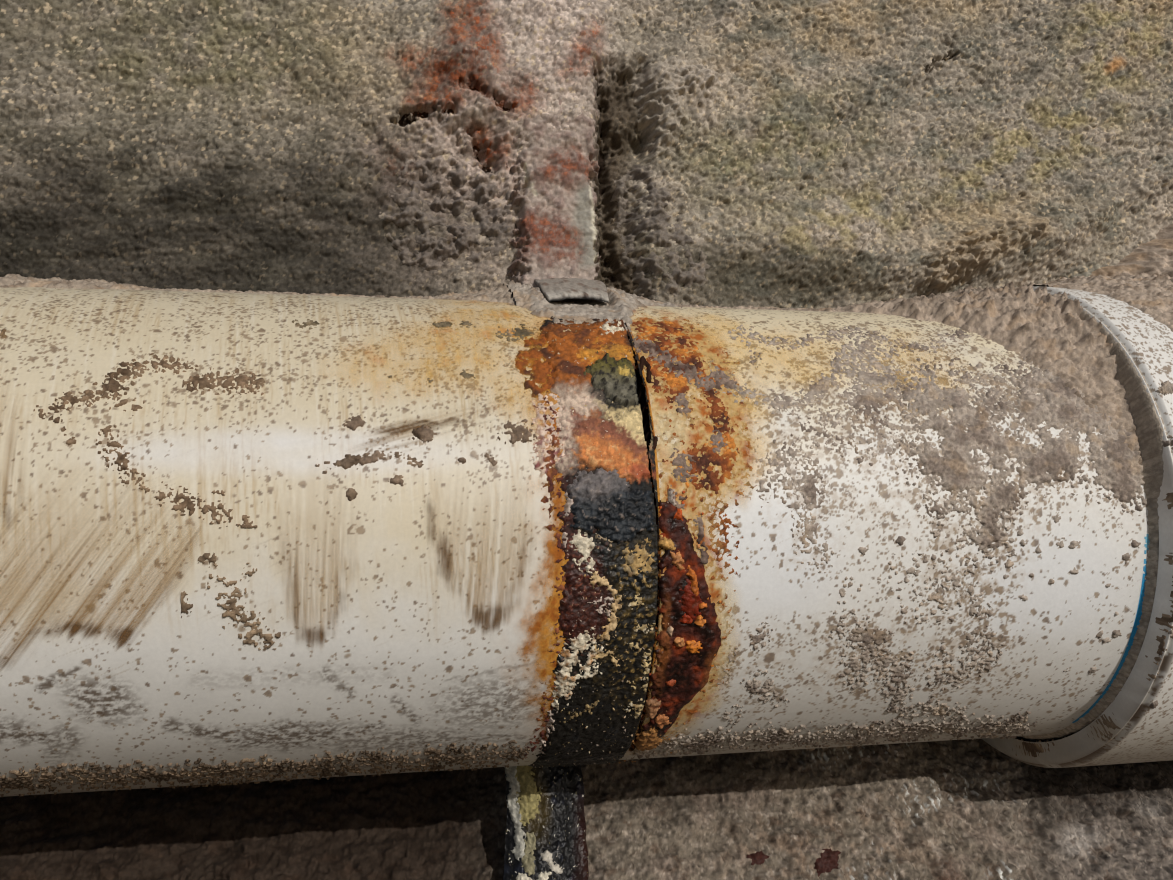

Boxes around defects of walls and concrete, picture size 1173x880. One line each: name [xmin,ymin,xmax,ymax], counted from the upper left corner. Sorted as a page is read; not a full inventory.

corrosion [482,311,569,759]
corrosion [609,309,759,764]